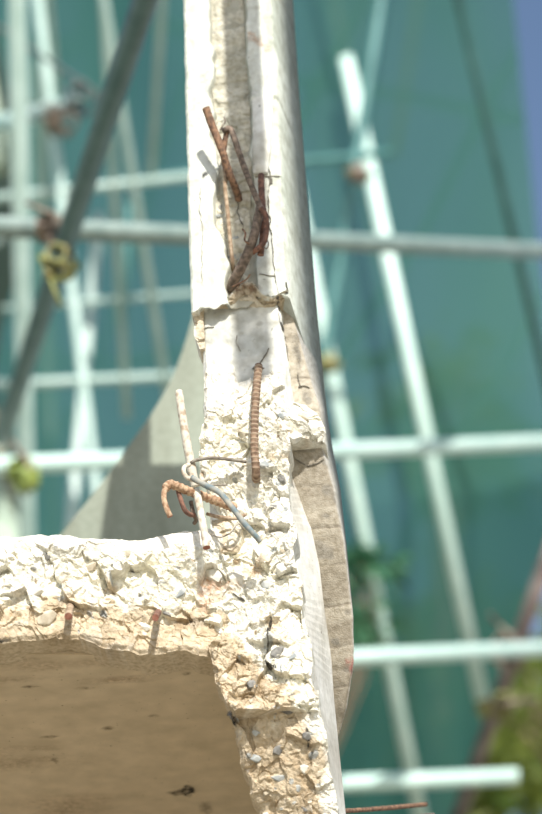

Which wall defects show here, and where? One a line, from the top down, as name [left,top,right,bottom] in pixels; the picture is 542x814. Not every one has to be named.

spalling [211,0,252,266]
spalling [0,262,339,814]
crack [265,612,277,671]